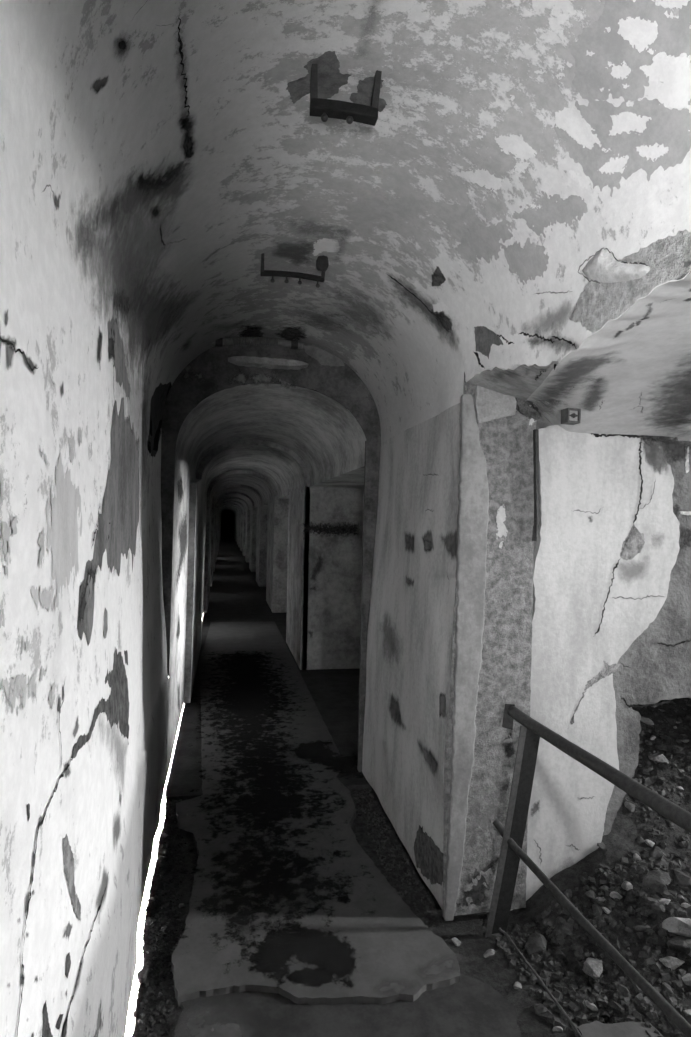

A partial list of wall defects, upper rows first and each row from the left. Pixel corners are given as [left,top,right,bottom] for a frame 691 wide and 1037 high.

crack [133,0,194,158]
spalling [286,51,387,112]
peeling [452,0,691,285]
leakage [81,163,189,362]
spalling [31,315,172,645]
crack [591,394,656,523]
spalling [71,648,129,774]
peeling [414,387,508,921]
crack [595,558,664,634]
crack [17,682,73,1035]
spalling [63,834,81,939]
crack [61,872,109,1037]